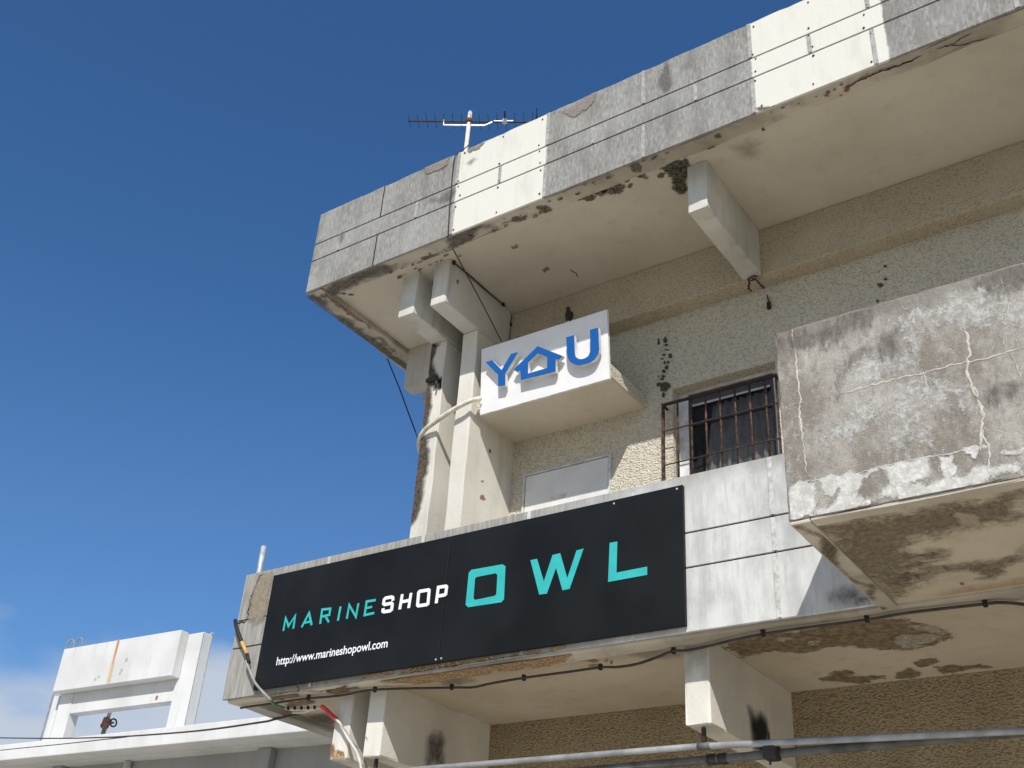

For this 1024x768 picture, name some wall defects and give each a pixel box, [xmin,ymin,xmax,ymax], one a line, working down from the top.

crack [847,33,989,87]
spalling [491,152,690,233]
spalling [389,235,474,279]
water stain [447,226,482,248]
water stain [307,266,407,370]
crack [791,280,1022,487]
peeling [789,438,1024,520]
water stain [794,489,1023,610]
peeling [722,617,995,684]